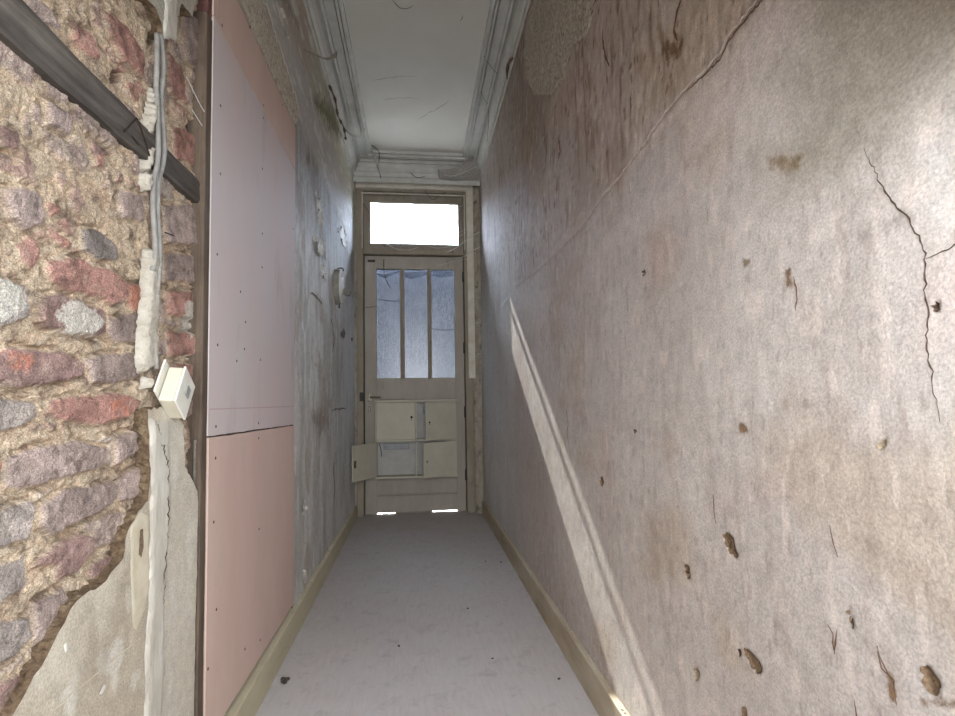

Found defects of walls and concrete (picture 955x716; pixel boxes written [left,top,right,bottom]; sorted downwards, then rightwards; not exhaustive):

flaking render [23,0,199,177]
flaking render [0,41,198,716]
crack [864,149,955,421]